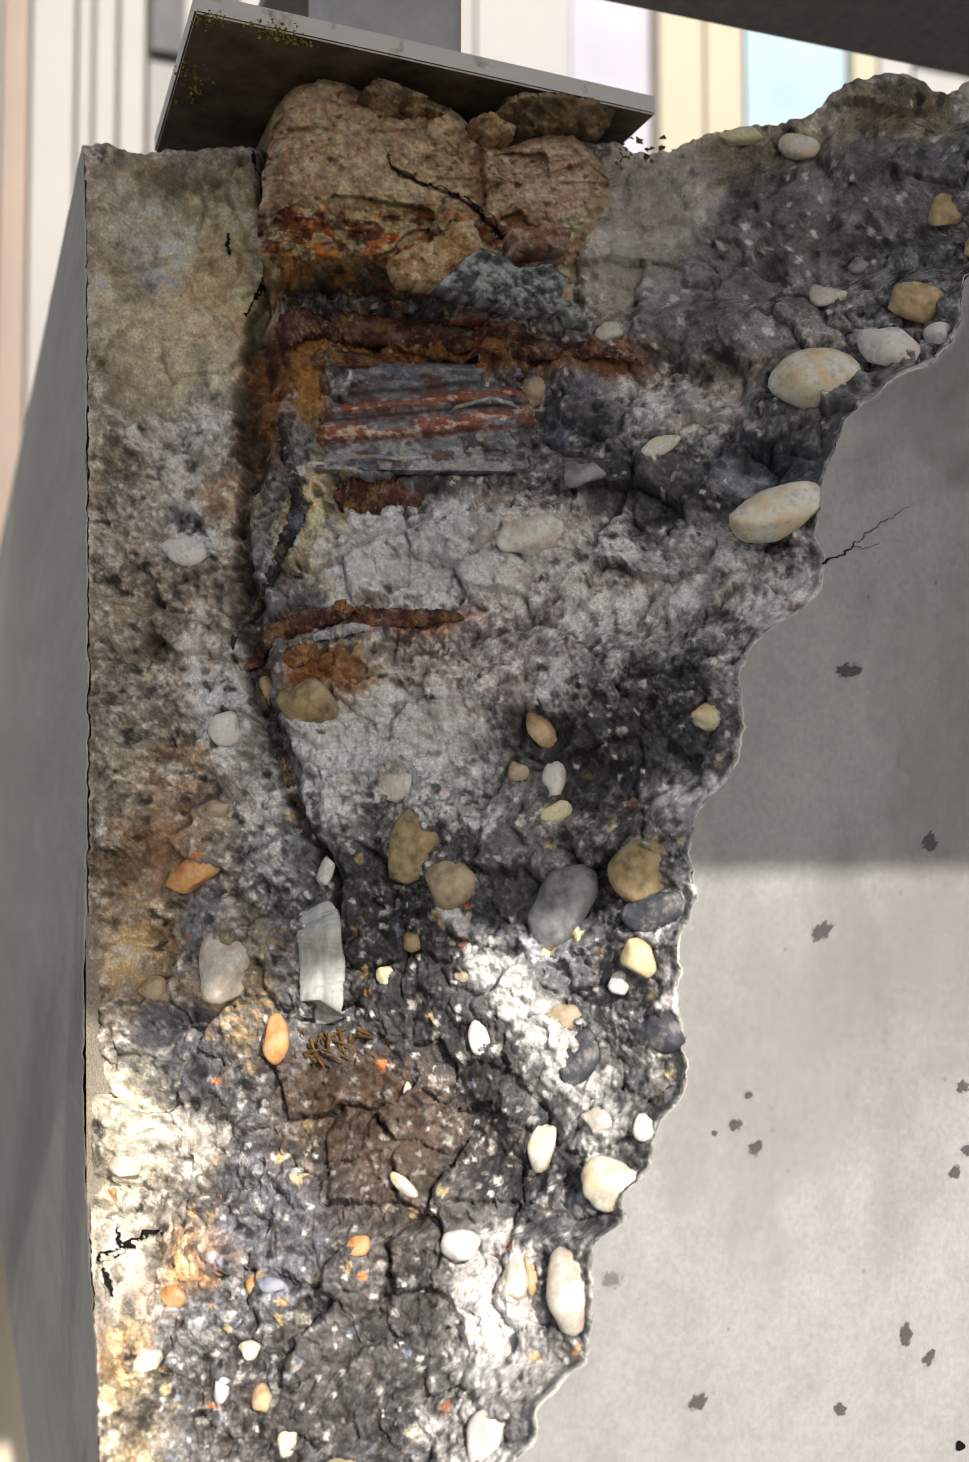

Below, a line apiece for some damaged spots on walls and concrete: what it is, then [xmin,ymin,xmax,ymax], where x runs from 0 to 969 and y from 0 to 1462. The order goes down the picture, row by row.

crack [385,148,508,239]
corrosion [274,288,637,419]
corrosion [333,475,422,515]
spalling [161,536,208,566]
crack [821,505,912,564]
corrosion [244,599,465,691]
spalling [208,711,239,746]
spalling [205,800,230,818]
spalling [137,975,170,1002]
spalling [579,1106,612,1135]
spalling [109,1155,141,1177]
spalling [82,1088,99,1448]